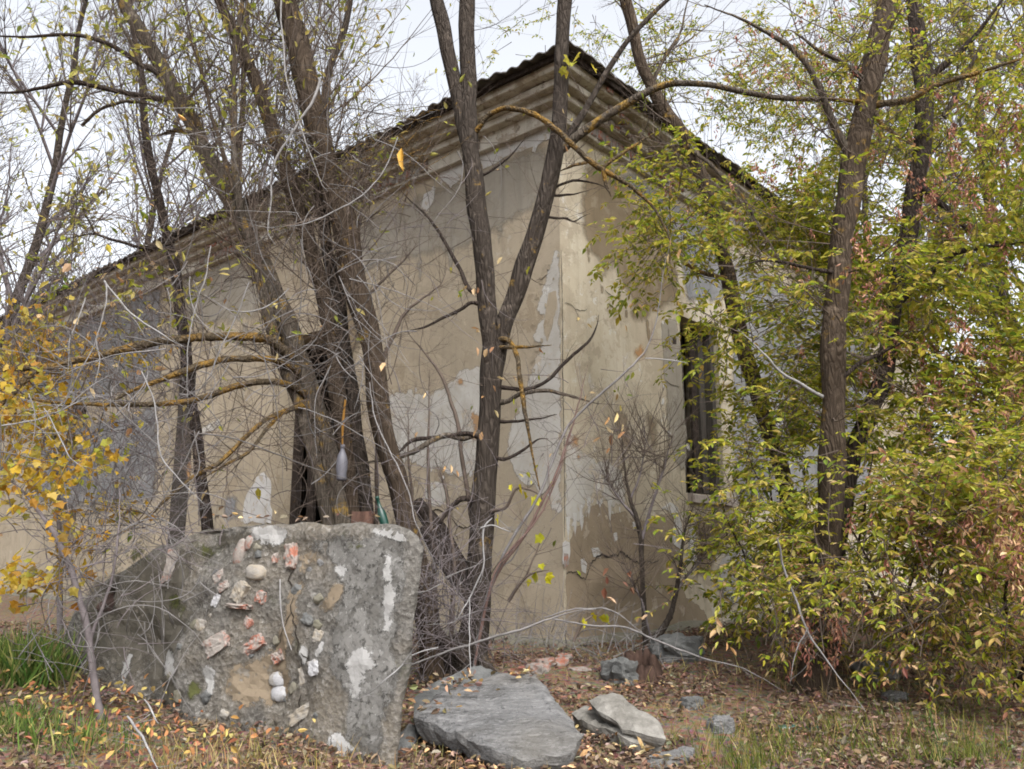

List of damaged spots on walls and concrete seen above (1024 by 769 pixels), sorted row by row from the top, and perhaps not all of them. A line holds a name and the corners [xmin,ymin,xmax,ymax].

peeling [240,472,272,524]
peeling [389,366,480,507]
peeling [507,250,708,640]